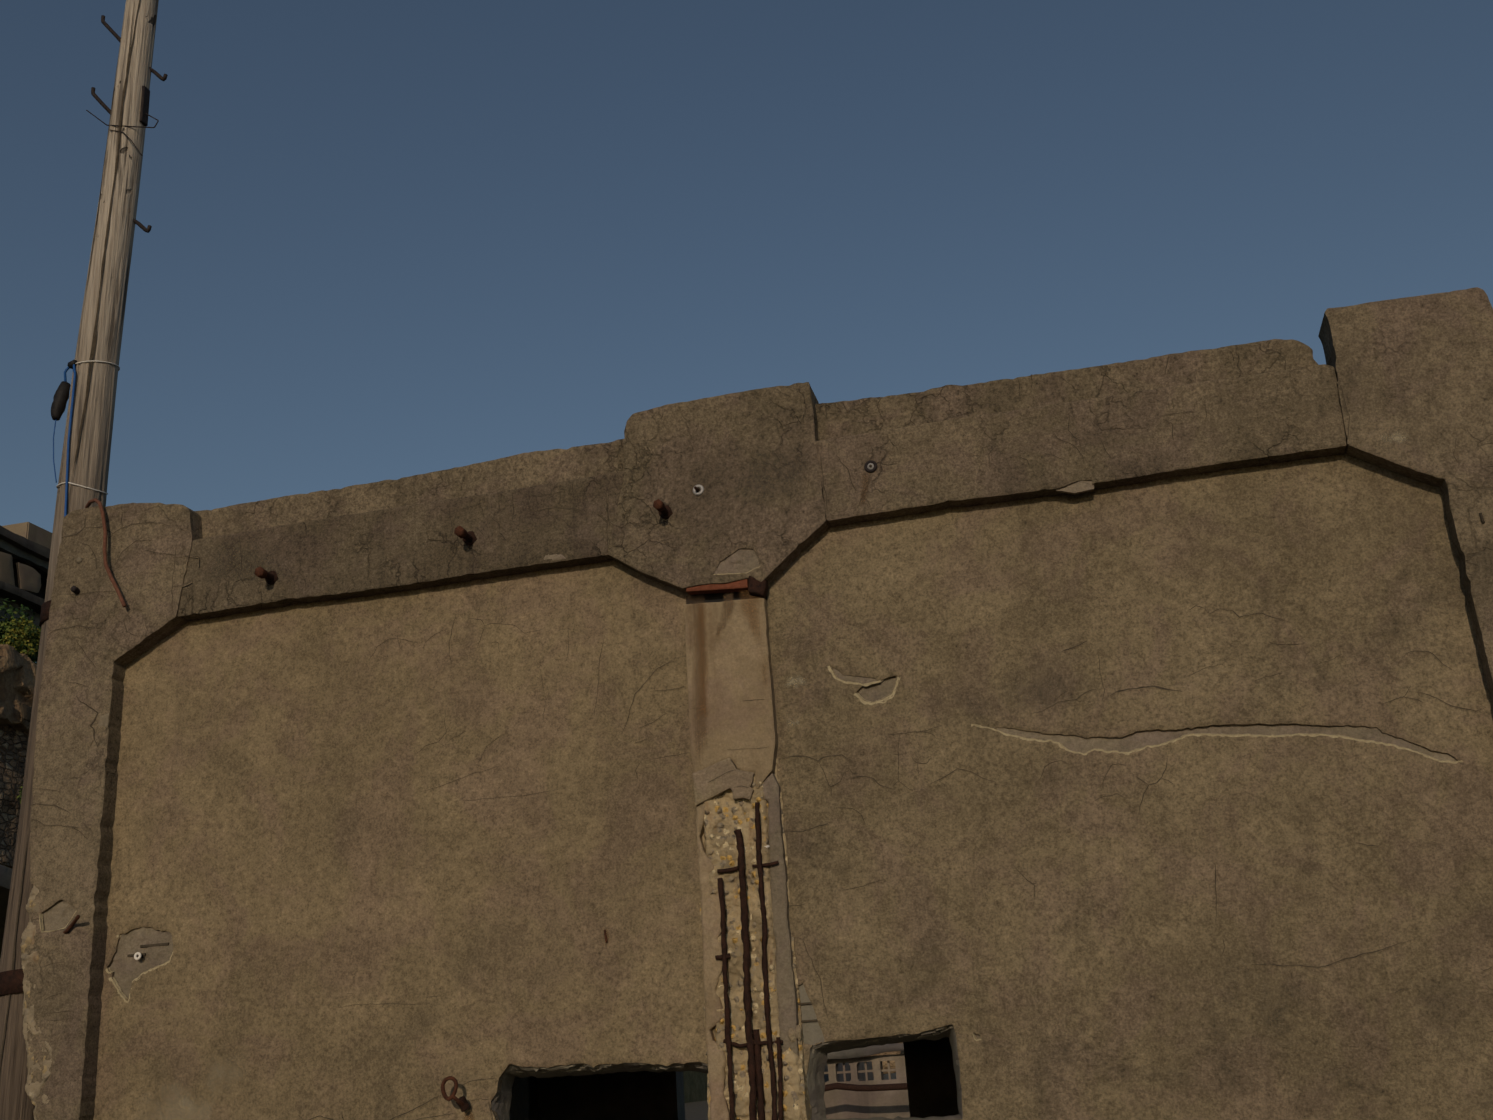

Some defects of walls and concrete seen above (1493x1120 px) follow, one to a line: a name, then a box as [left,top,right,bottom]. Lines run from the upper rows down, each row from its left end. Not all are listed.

spalling [828,666,901,705]
crack [367,605,1486,833]
spalling [20,885,76,1120]
spalling [106,927,173,1003]
spalling [781,984,829,1120]